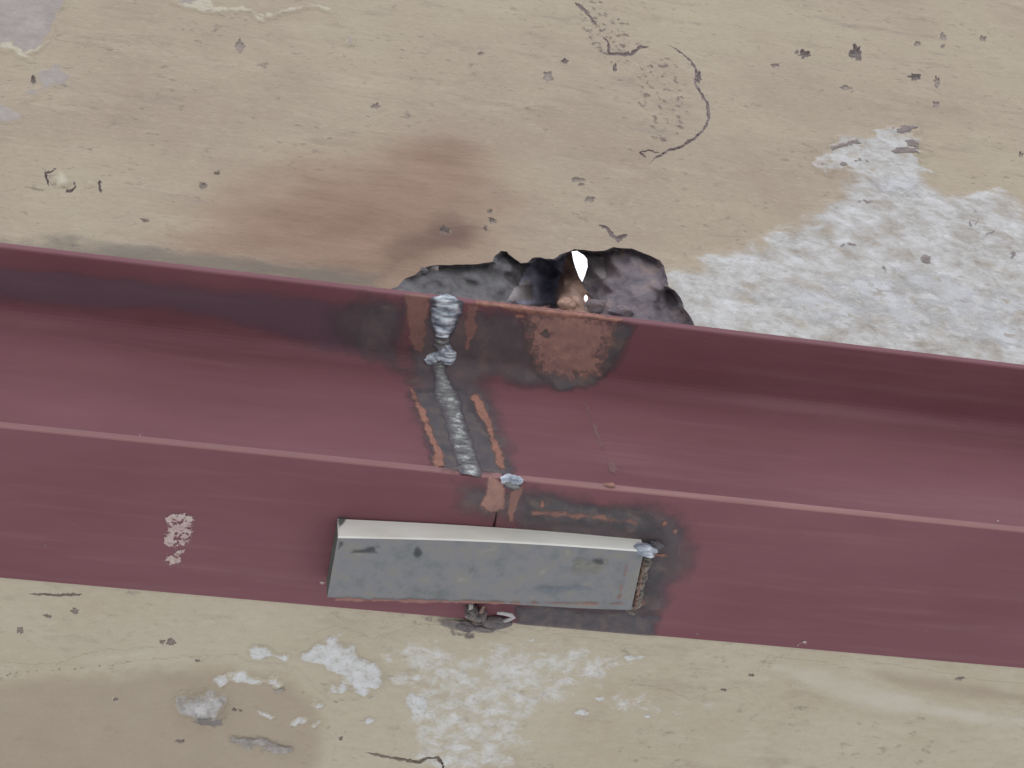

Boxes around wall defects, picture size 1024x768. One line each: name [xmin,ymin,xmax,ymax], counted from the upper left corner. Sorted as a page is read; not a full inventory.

crack [575,2,710,164]
water stain [662,117,1024,365]
corrosion [405,294,430,353]
spalling [392,247,694,325]
corrosion [464,300,624,381]
corrosion [409,387,445,468]
corrosion [471,394,523,522]
water stain [375,624,753,768]
crack [368,752,444,768]